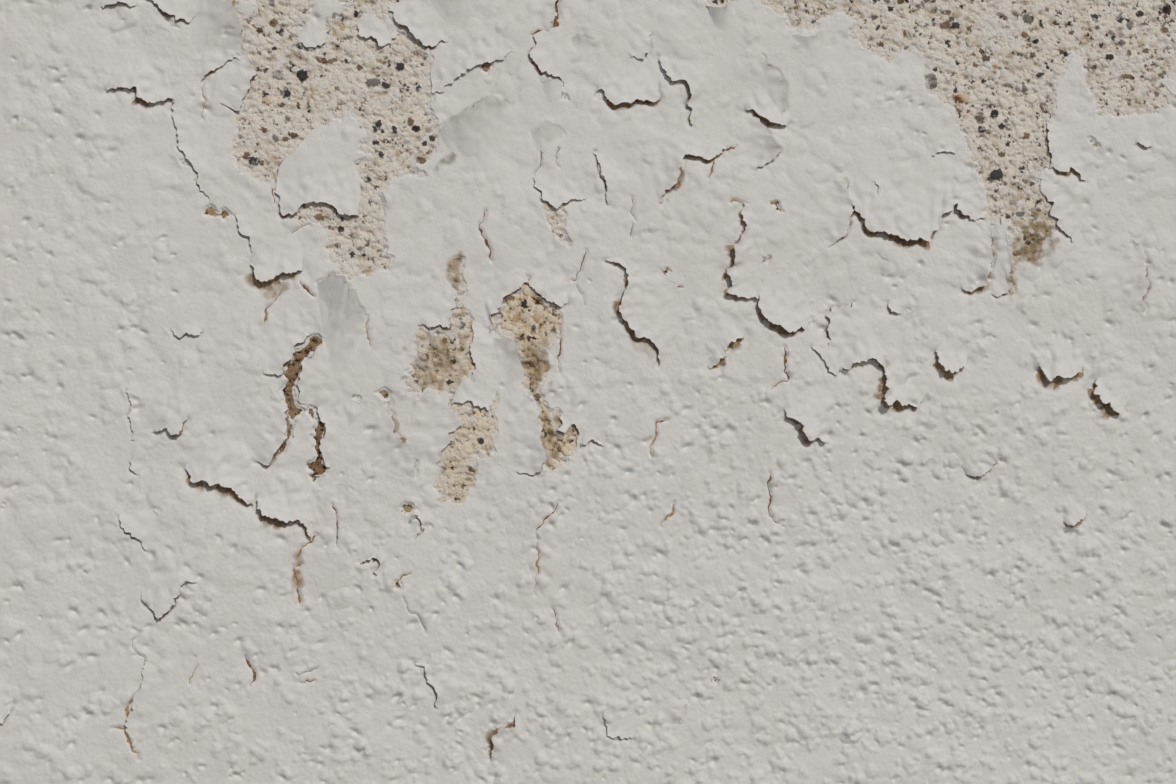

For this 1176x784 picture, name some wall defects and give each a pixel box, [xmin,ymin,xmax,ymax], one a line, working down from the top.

peeling [595,53,789,203]
peeling [760,0,1176,297]
peeling [107,0,603,541]
crack [478,212,491,258]
peeling [723,199,811,335]
crack [771,348,790,389]
peeling [784,302,967,444]
peeling [1037,339,1132,417]
crack [767,472,784,527]
crack [534,503,559,631]
crack [114,634,197,759]
crack [245,657,256,685]